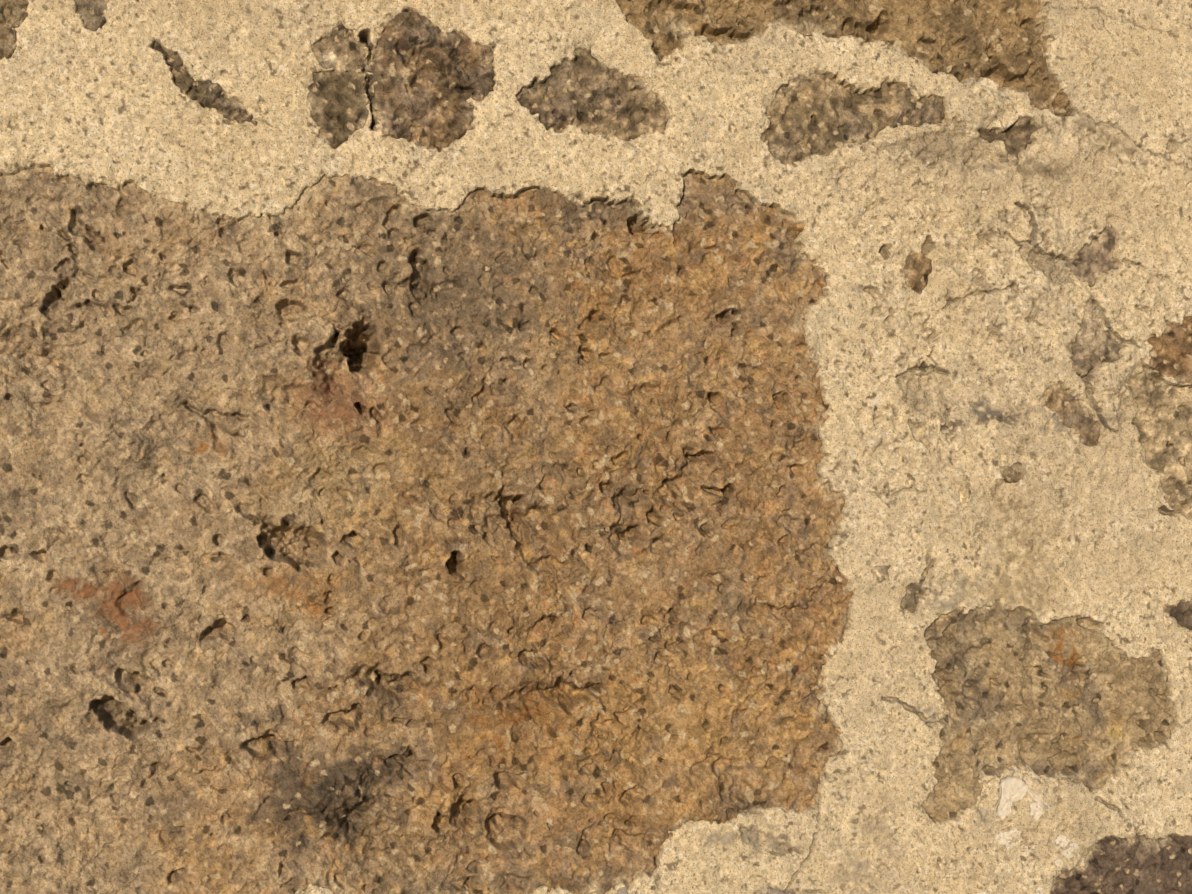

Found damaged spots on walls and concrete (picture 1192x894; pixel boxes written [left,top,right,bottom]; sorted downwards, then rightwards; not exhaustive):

crack [1052,6,1180,42]
crack [1072,105,1192,171]
spalling [68,205,110,257]
crack [1005,201,1074,264]
spalling [41,285,62,323]
spalling [408,247,431,317]
crack [942,283,1015,311]
crack [1090,292,1140,347]
crack [1122,258,1146,269]
spalling [238,734,297,763]
spalling [440,794,529,856]
peeling [976,775,1050,850]